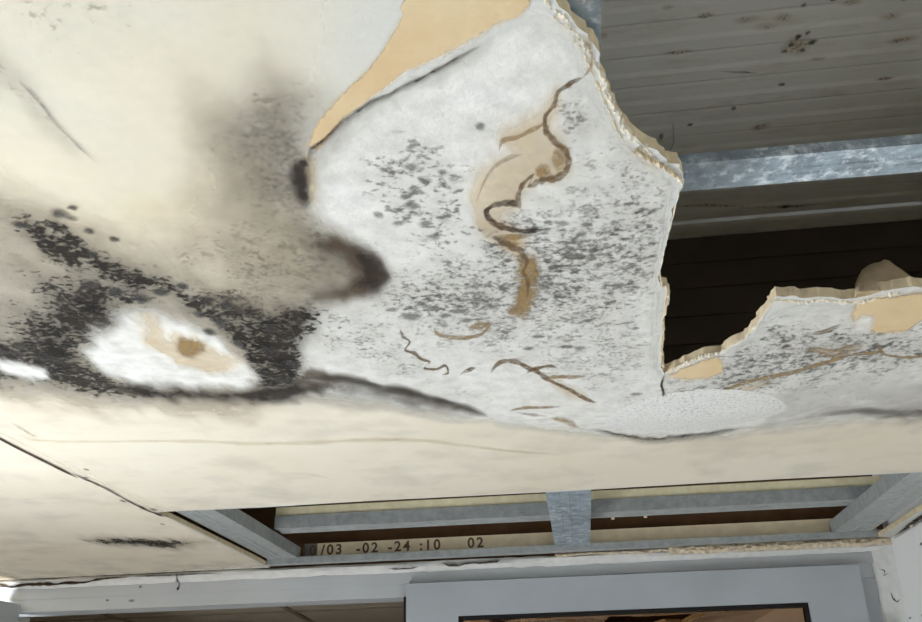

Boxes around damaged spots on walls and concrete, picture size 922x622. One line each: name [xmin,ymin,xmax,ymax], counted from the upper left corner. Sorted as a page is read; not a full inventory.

water stain [0,27,478,415]
water stain [387,79,657,363]
peeling [299,0,922,435]
peeling [0,361,48,379]
peeling [86,314,256,388]
peeling [0,394,922,580]
water stain [493,359,592,402]
water stain [513,406,575,426]